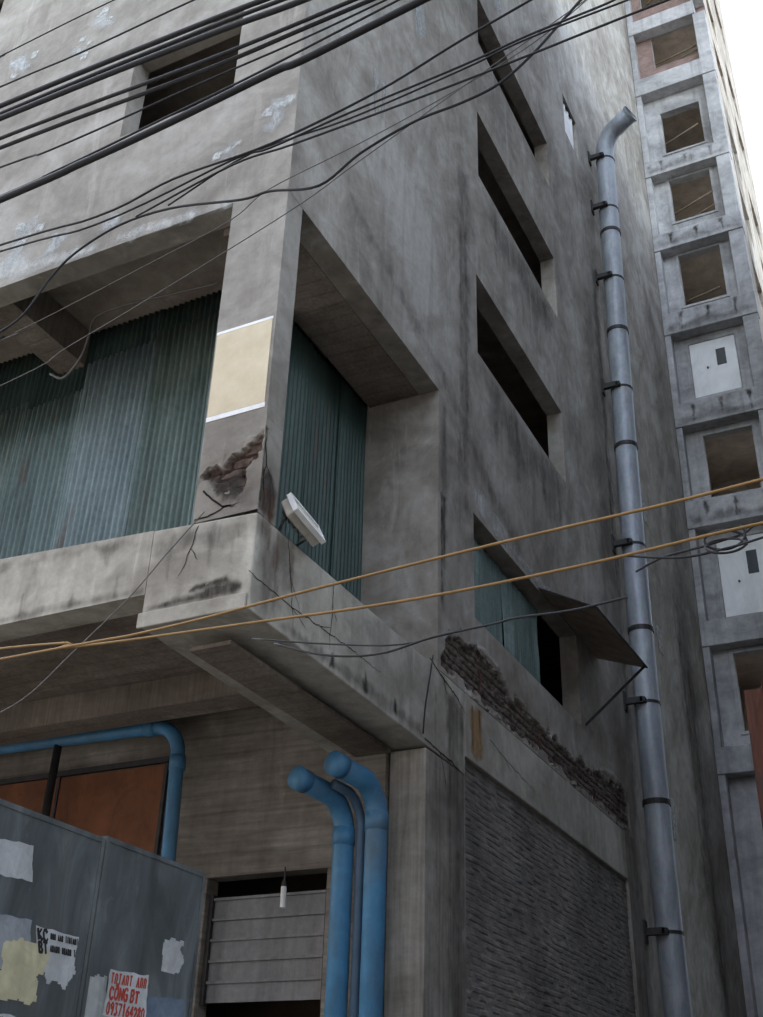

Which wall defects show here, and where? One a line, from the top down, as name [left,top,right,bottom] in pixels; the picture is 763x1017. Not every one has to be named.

flaking render [262,95,295,123]
spalling [192,415,268,524]
crack [178,525,199,576]
damp [159,577,240,607]
crack [250,540,384,675]
spalling [438,596,635,839]